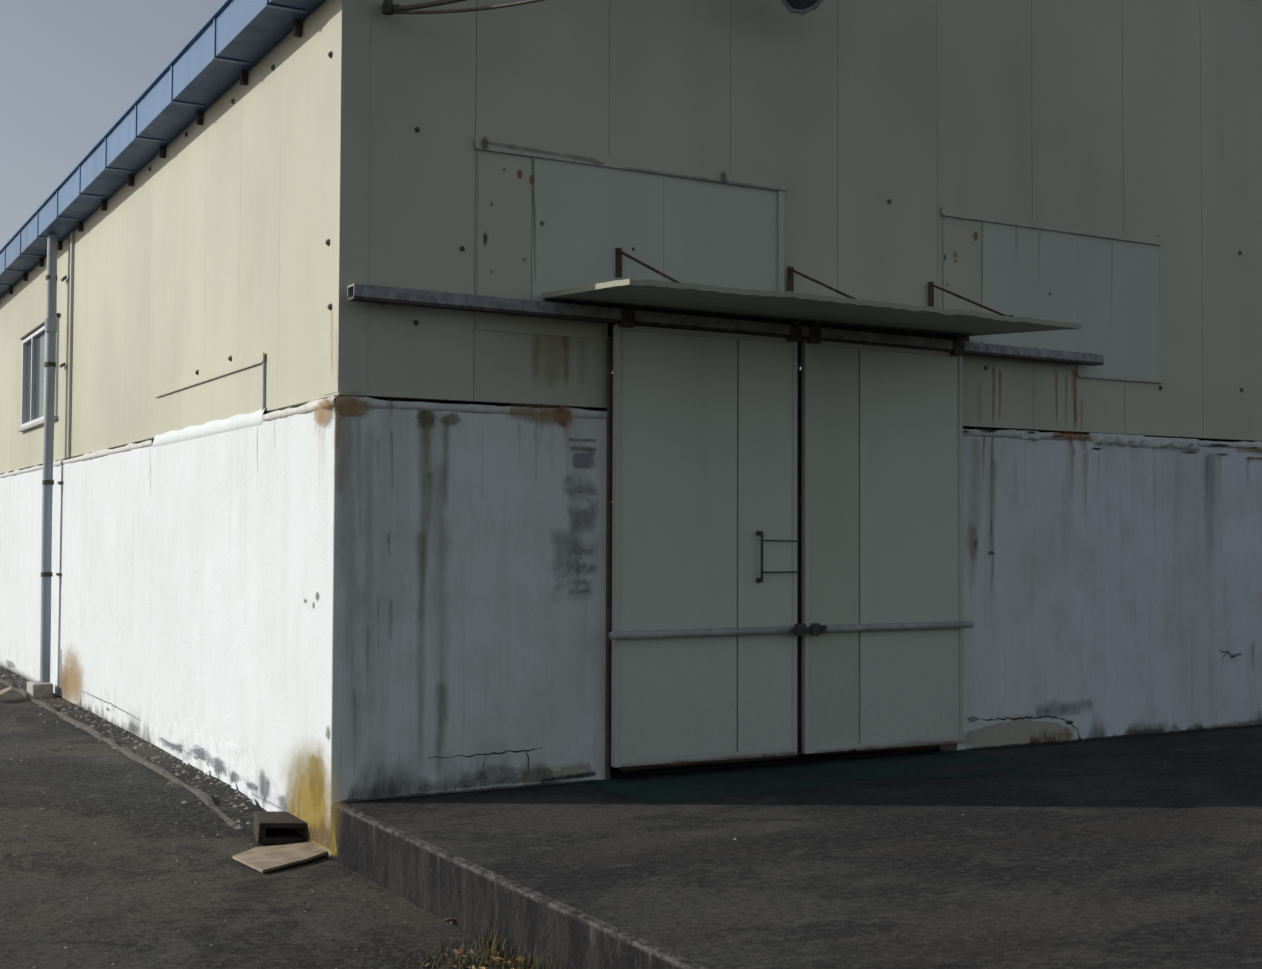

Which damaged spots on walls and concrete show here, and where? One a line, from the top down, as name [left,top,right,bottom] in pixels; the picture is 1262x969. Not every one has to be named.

rust [314,395,368,426]
rust [510,405,573,426]
damp [417,410,457,455]
rust [60,655,81,700]
spalling [965,716,1081,748]